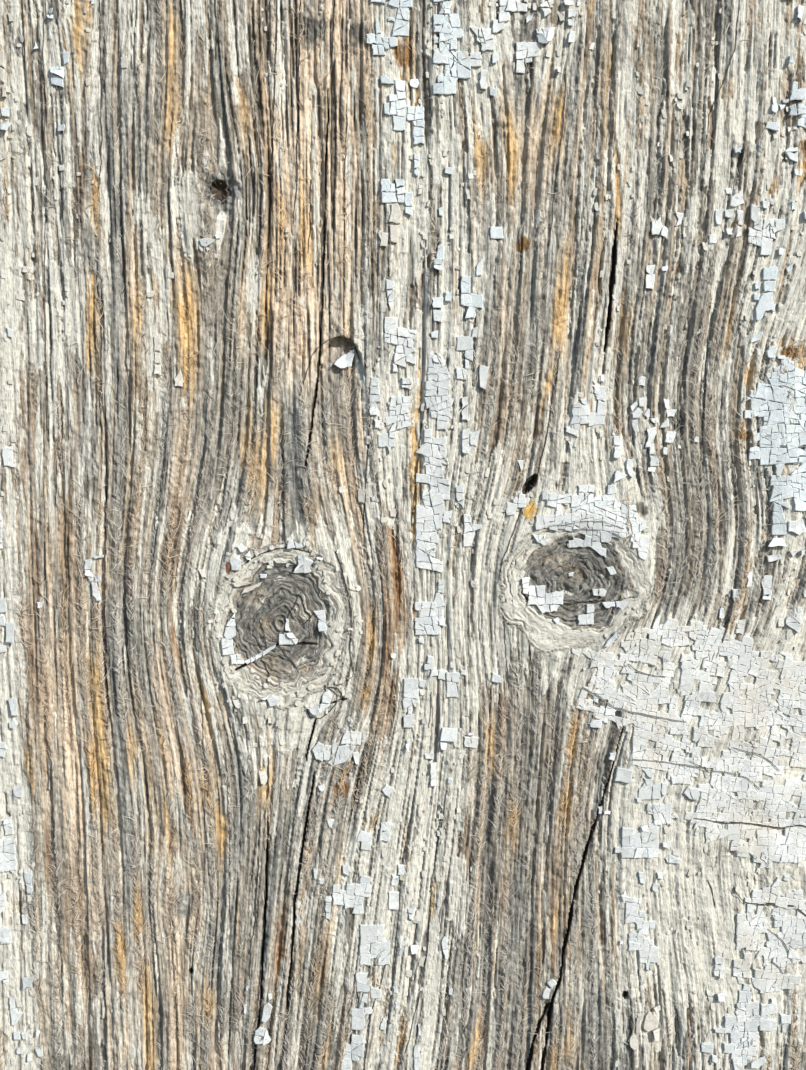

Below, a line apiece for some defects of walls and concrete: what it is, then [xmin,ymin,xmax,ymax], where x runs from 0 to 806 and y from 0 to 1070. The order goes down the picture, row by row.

peeling [366,0,413,56]
peeling [378,75,425,247]
peeling [433,0,555,97]
peeling [645,265,668,290]
peeling [651,212,683,239]
peeling [765,82,806,132]
crack [176,0,354,1070]
peeling [370,260,489,644]
peeling [709,188,806,562]
peeling [402,656,466,752]
crack [526,687,779,1070]
peeling [571,572,806,1070]